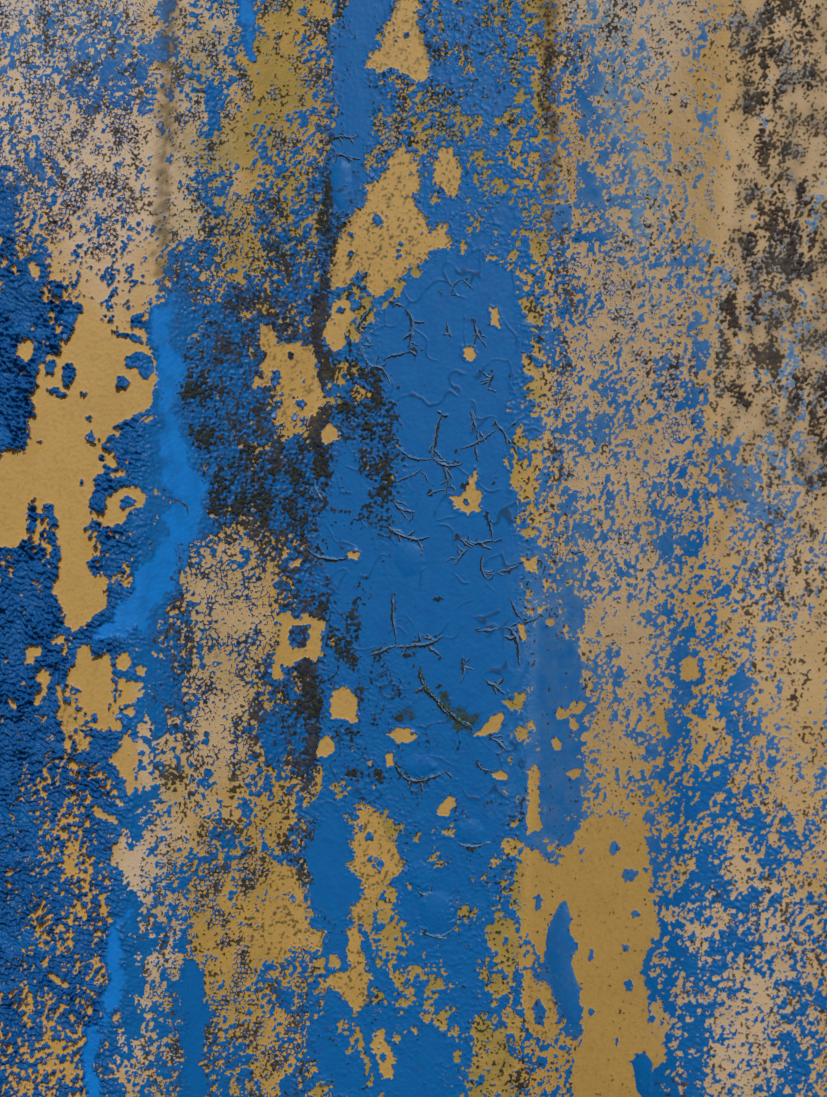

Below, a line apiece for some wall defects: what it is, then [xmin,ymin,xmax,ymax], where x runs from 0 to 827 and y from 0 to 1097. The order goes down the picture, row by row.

peeling [252,141,463,426]
crack [448,279,475,297]
peeling [0,312,158,632]
crack [305,546,347,564]
crack [355,302,542,772]
peeling [25,644,150,795]
peeling [267,612,327,681]
peeling [313,800,408,1016]
crack [394,762,453,794]
crack [457,842,491,850]
peeling [519,765,667,1097]
peeling [370,1027,396,1079]